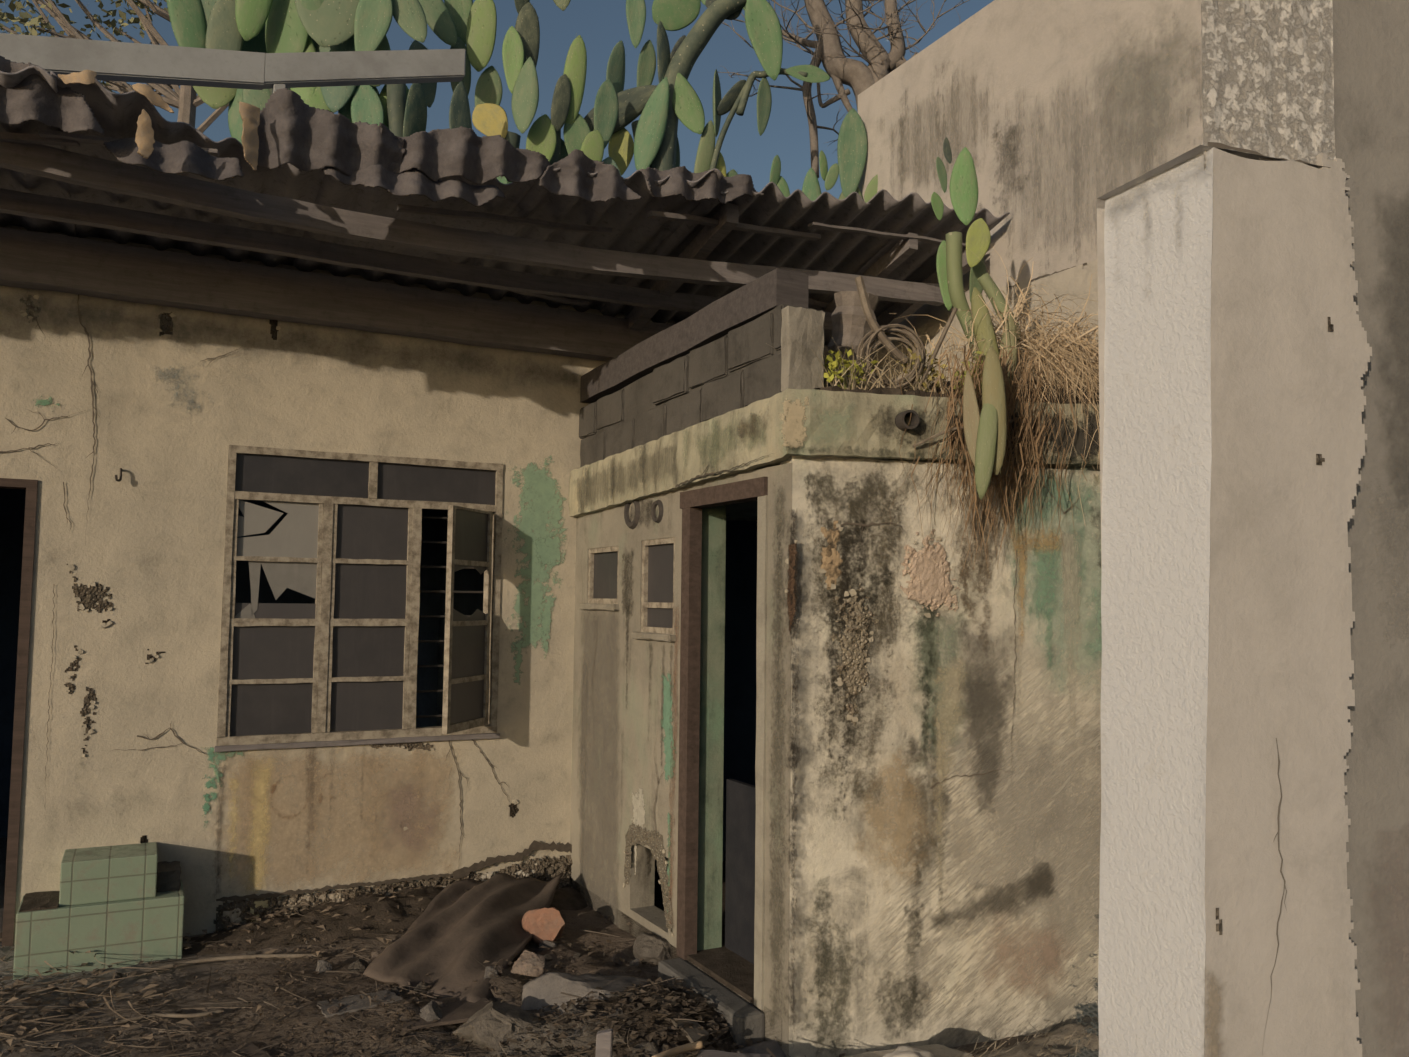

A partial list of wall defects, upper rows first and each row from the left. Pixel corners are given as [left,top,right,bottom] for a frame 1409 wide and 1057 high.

water stain [994,43,1176,250]
crack [0,295,100,544]
water stain [779,396,809,449]
water stain [942,406,967,446]
water stain [1006,409,1100,461]
flaking render [67,564,113,628]
flaking render [899,529,960,618]
flaking render [64,645,97,757]
crack [445,739,514,869]
water stain [769,473,923,1047]
water stain [905,557,1101,954]
spalling [623,823,674,936]